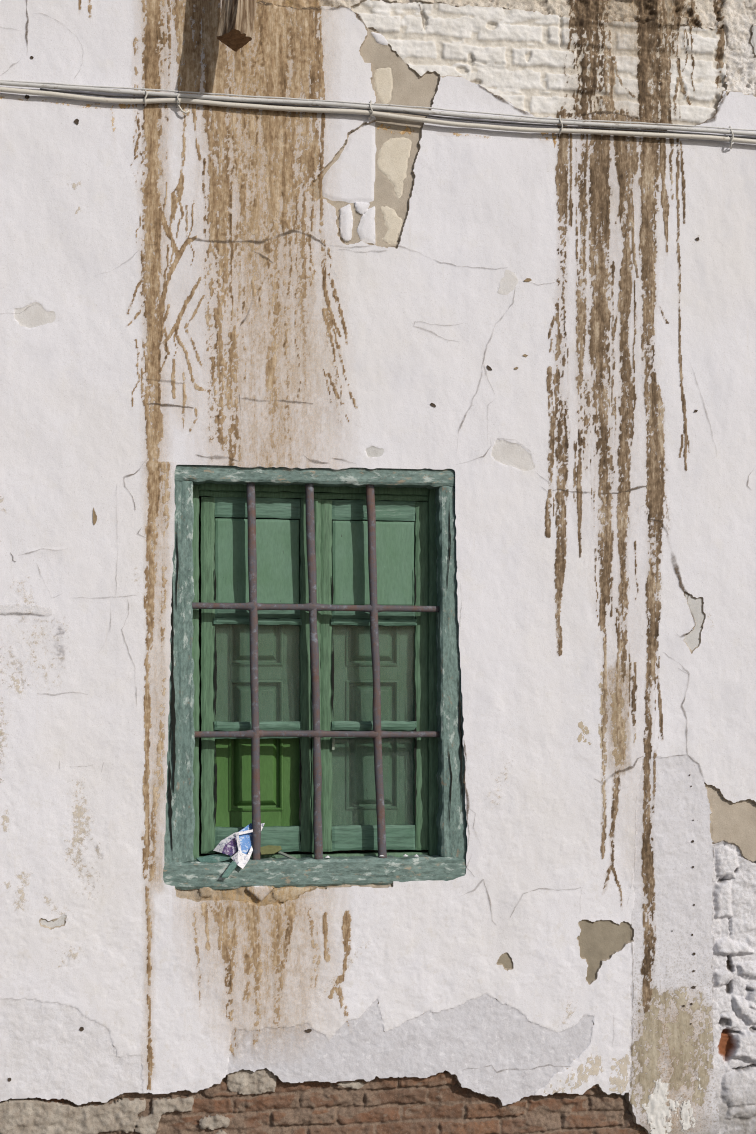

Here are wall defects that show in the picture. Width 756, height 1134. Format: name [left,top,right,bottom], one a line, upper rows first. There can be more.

flaking render [309,0,756,249]
peeling [14,302,56,328]
leakage [127,0,358,1090]
peeling [491,440,535,471]
leakage [545,0,713,1114]
peeling [684,591,706,654]
flaking render [0,782,756,1134]